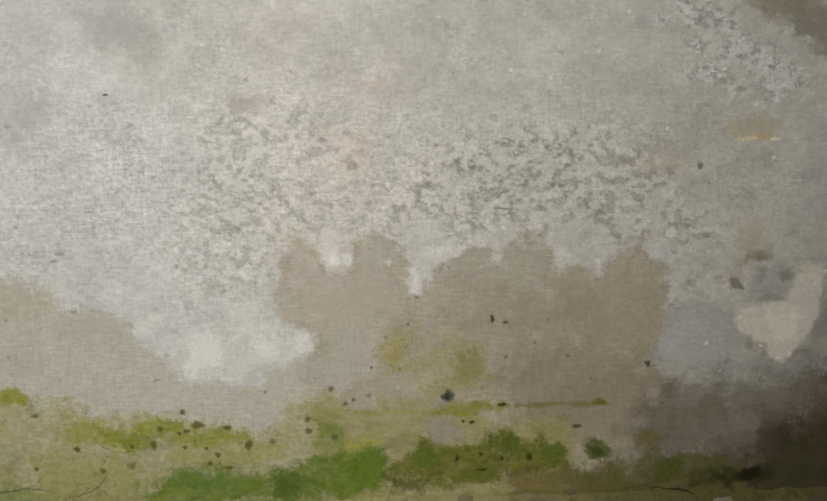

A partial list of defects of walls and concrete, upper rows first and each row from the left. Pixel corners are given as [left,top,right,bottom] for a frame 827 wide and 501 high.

leakage [747,0,827,58]
leakage [0,214,827,491]
crack [1,478,48,493]